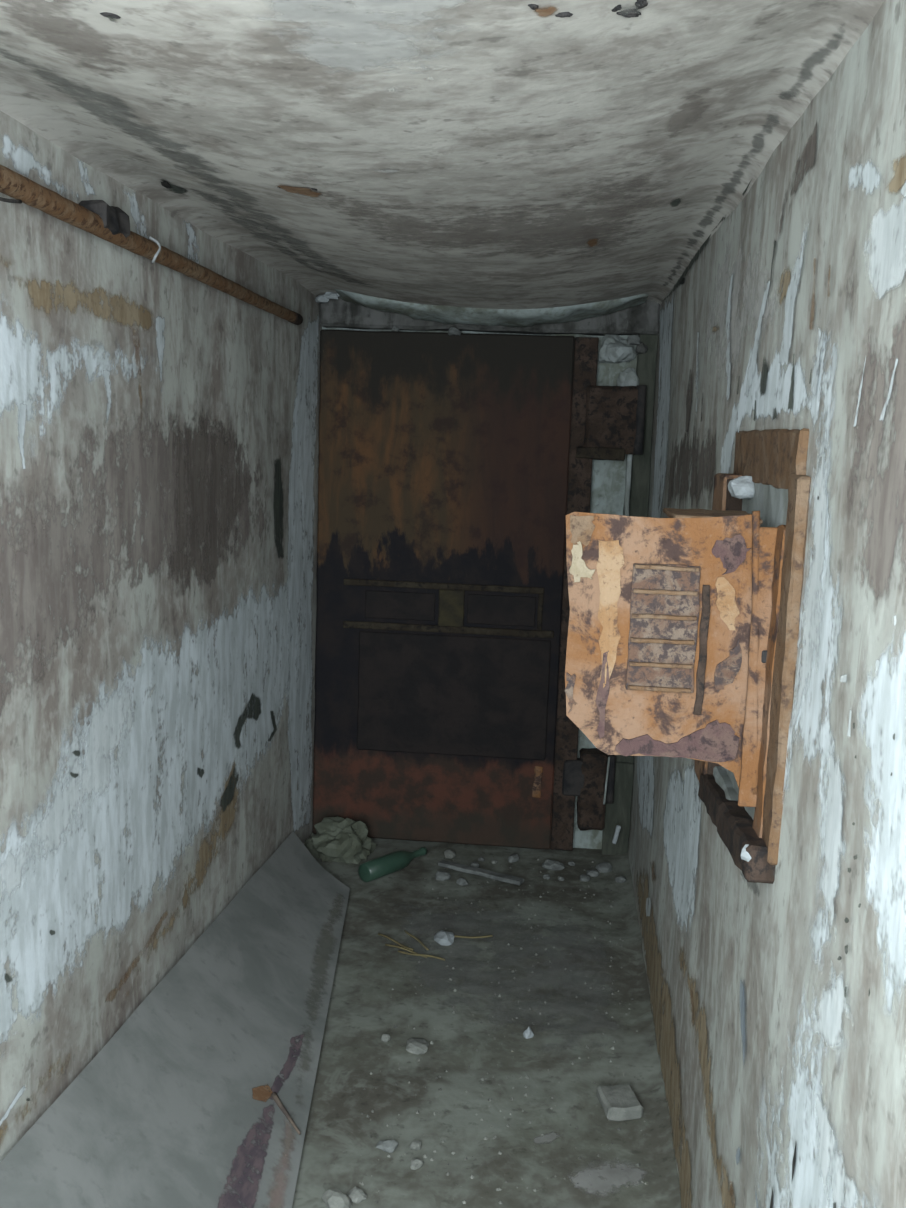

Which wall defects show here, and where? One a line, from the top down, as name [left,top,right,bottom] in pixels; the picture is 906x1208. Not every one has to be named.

damp [0,0,124,71]
damp [259,0,463,71]
damp [780,35,841,99]
damp [2,135,95,197]
damp [34,66,368,285]
damp [326,176,651,255]
peeling [849,161,880,194]
peeling [864,183,906,299]
damp [0,312,284,715]
rust [636,862,692,1208]
rust [680,949,735,1208]